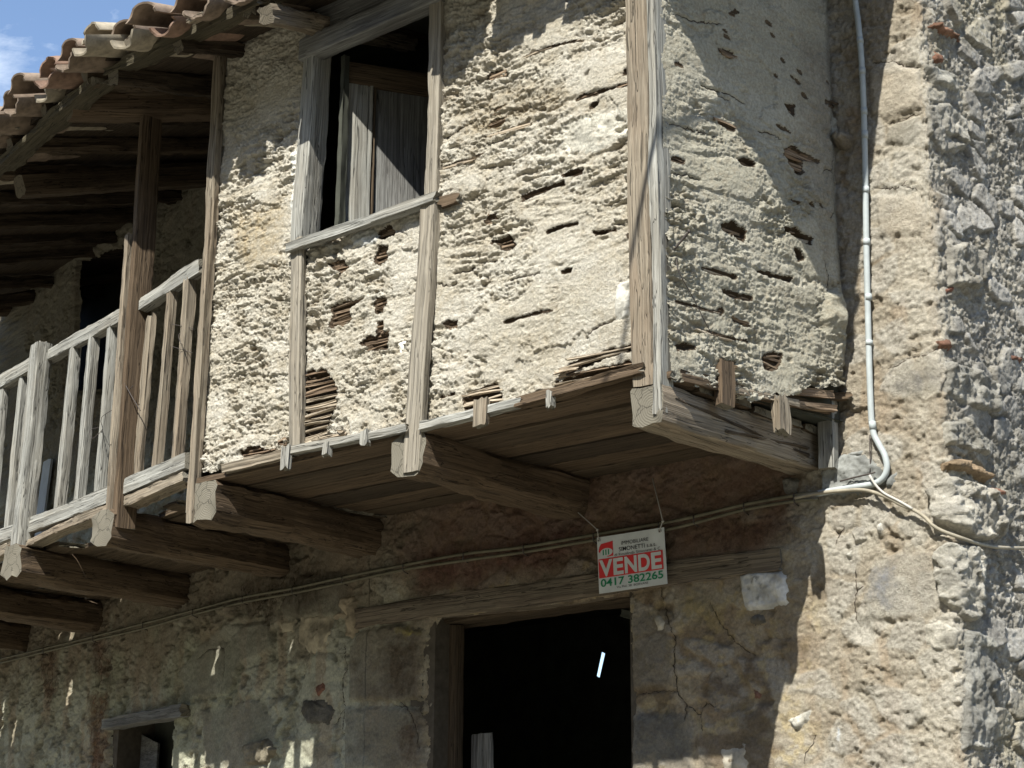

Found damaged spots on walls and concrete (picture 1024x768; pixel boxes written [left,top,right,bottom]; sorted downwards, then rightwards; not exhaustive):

spalling [774,57,820,175]
spalling [721,220,747,242]
spalling [328,296,389,353]
spalling [551,344,632,387]
spalling [762,351,783,371]
spalling [304,368,347,443]
spalling [440,383,503,411]
crack [639,587,714,731]